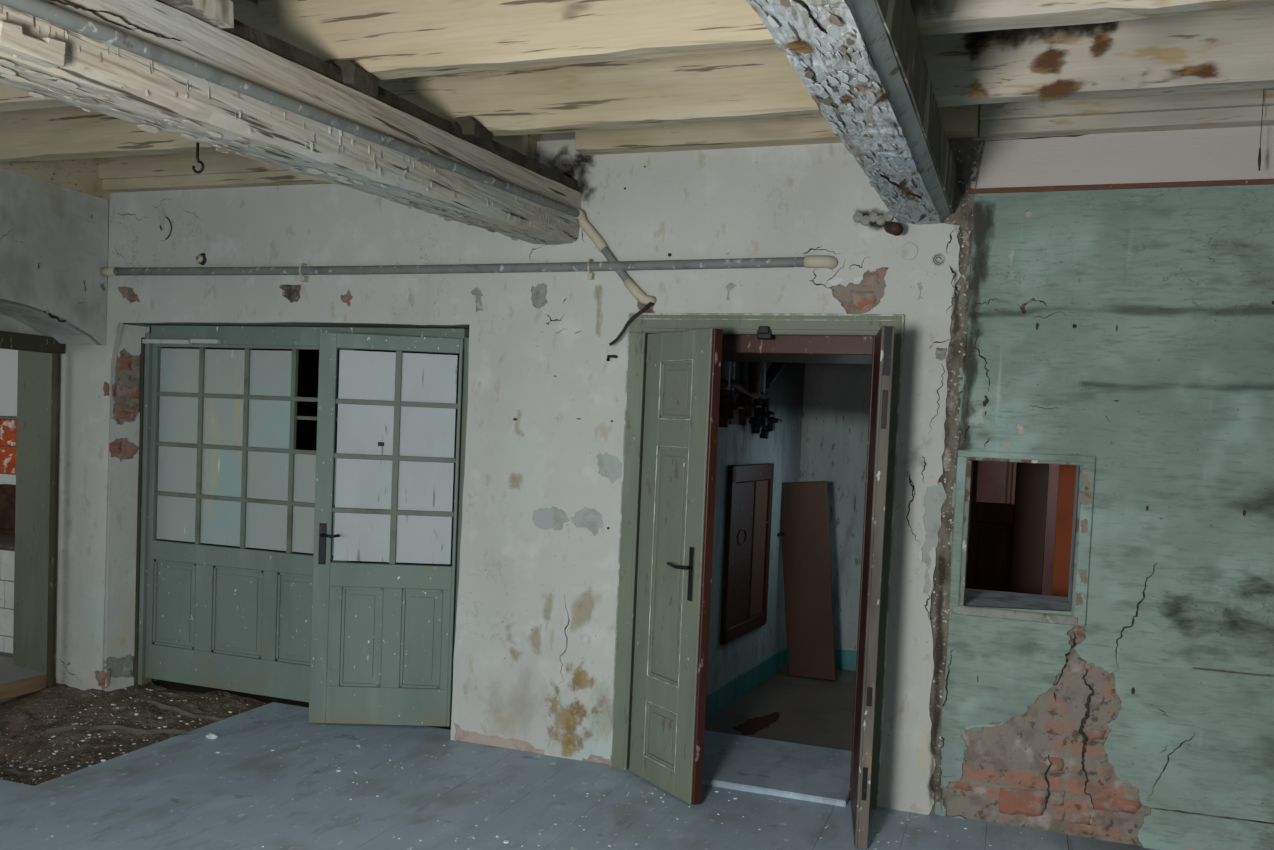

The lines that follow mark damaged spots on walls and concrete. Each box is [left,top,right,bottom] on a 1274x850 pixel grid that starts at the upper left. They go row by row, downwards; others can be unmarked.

leakage [1031,42,1081,99]
leakage [1090,27,1112,57]
leakage [1174,64,1216,78]
flaking render [827,267,888,314]
flaking render [103,349,140,461]
crack [906,230,998,540]
leakage [574,593,593,625]
crack [1115,562,1157,667]
spalling [0,654,267,786]
flaking render [941,626,1151,846]
crack [1152,736,1274,824]